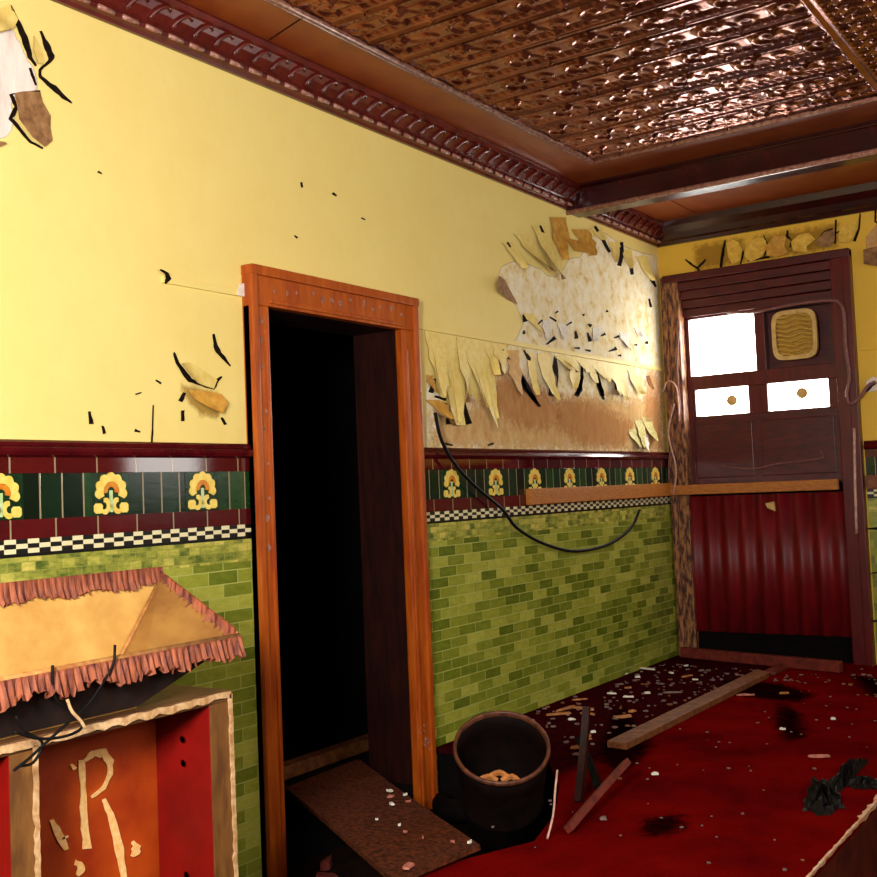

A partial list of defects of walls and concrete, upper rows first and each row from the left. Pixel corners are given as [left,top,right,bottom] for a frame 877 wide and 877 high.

peeling [0,4,72,149]
peeling [726,221,857,265]
peeling [863,225,877,266]
peeling [425,217,664,452]
peeling [182,362,228,417]